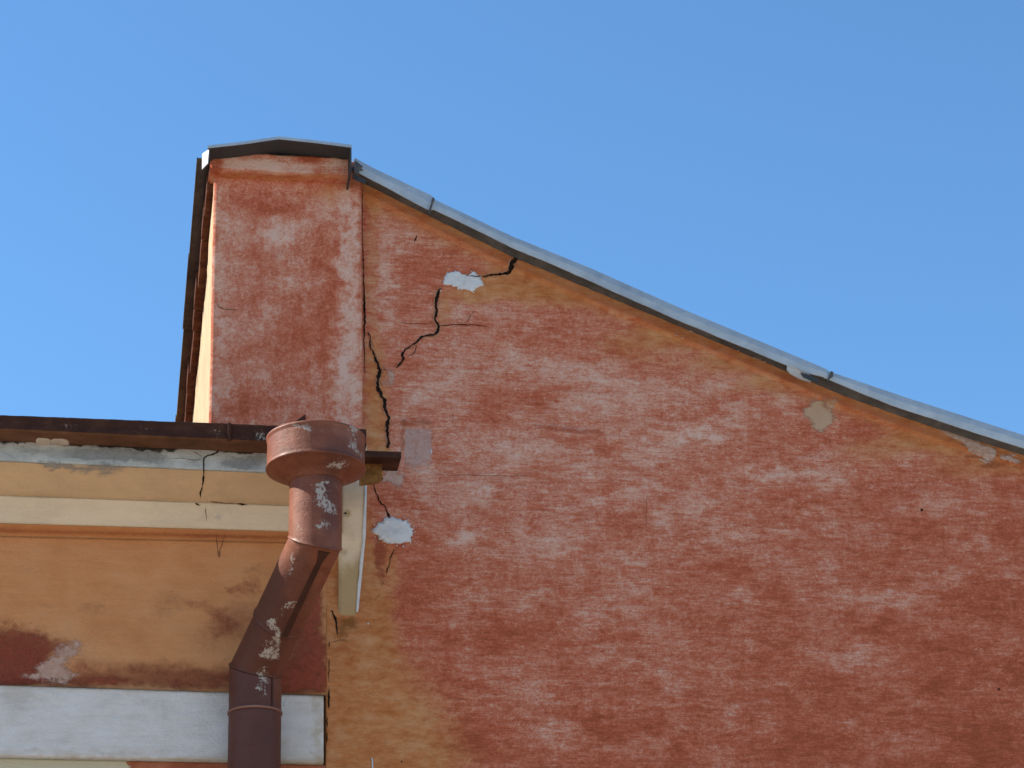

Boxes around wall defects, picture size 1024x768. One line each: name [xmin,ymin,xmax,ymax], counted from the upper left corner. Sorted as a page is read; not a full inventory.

crack [470,257,518,278]
crack [362,193,487,448]
spalling [803,400,836,433]
crack [175,451,248,556]
peeling [24,641,82,684]